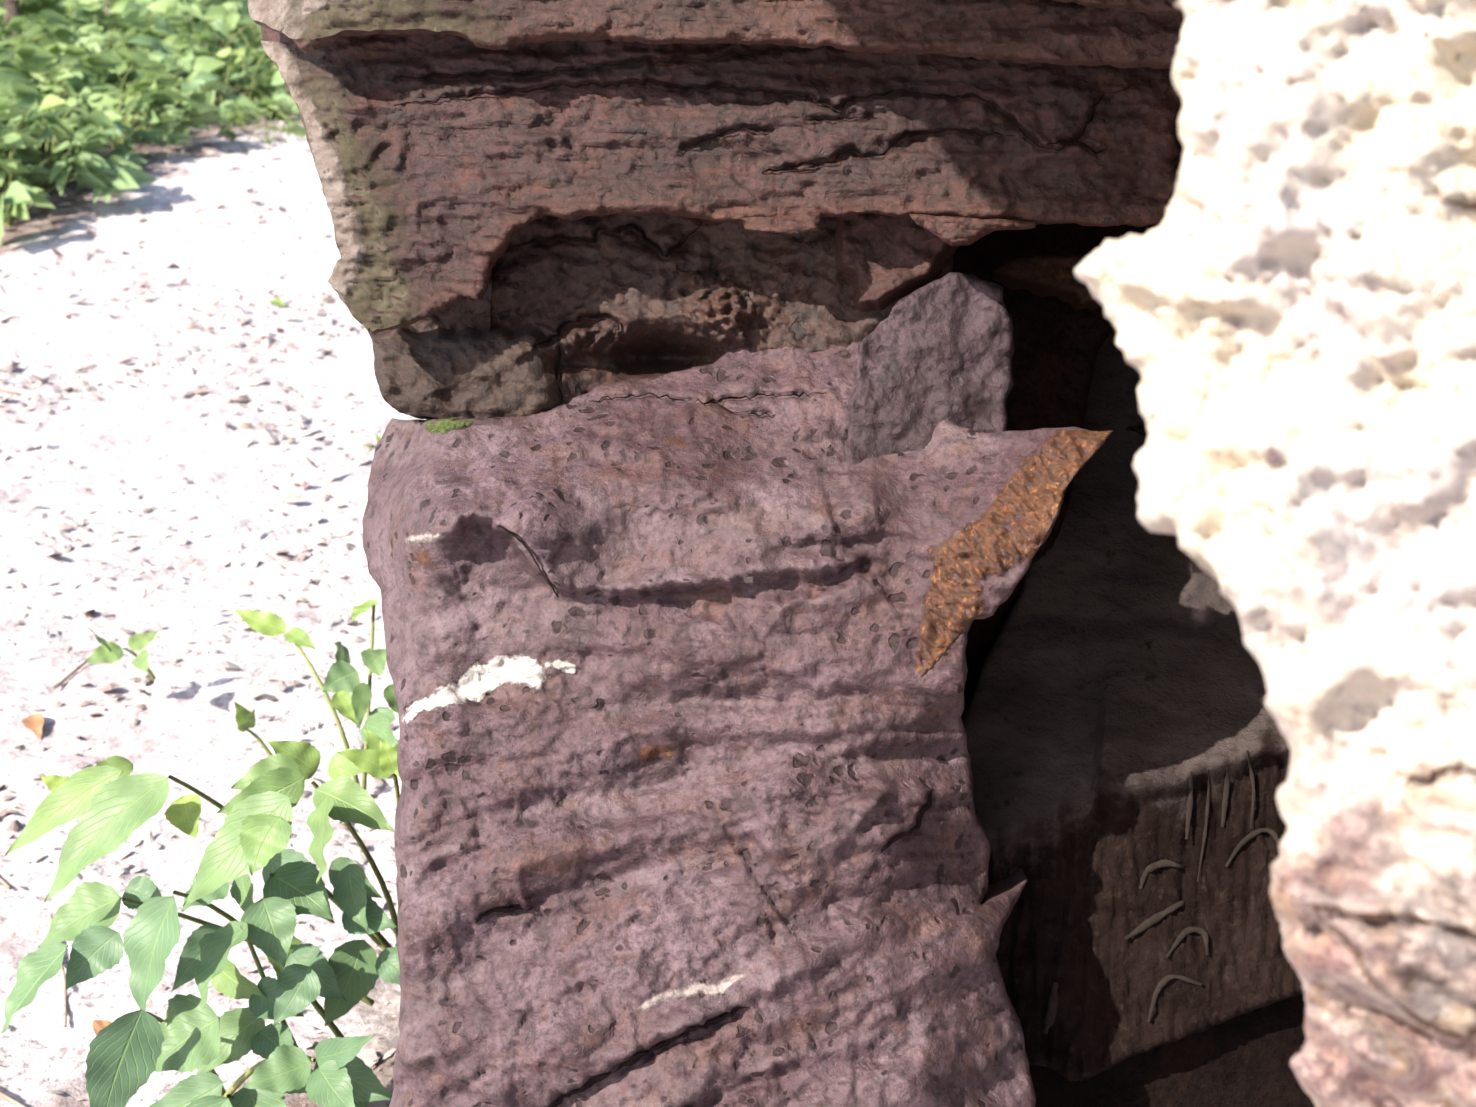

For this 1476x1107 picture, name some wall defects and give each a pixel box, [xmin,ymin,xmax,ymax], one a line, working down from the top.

crack [550,1007,749,1107]